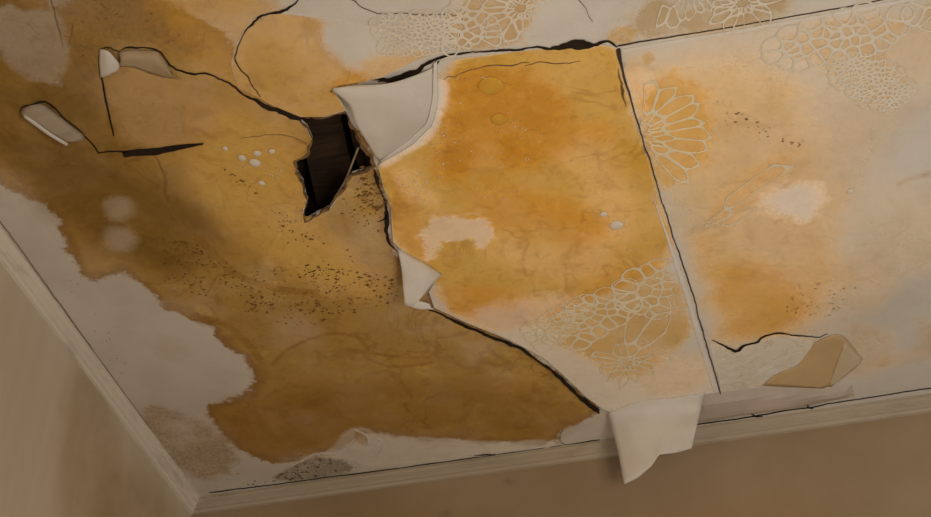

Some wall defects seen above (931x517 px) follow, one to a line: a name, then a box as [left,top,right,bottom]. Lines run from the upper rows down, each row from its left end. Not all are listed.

crack [330,0,617,92]
crack [19,0,307,198]
peeling [407,82,445,151]
leakage [669,84,810,193]
leakage [0,0,670,482]
crack [373,169,397,252]
crack [712,332,828,353]
crack [697,388,931,425]